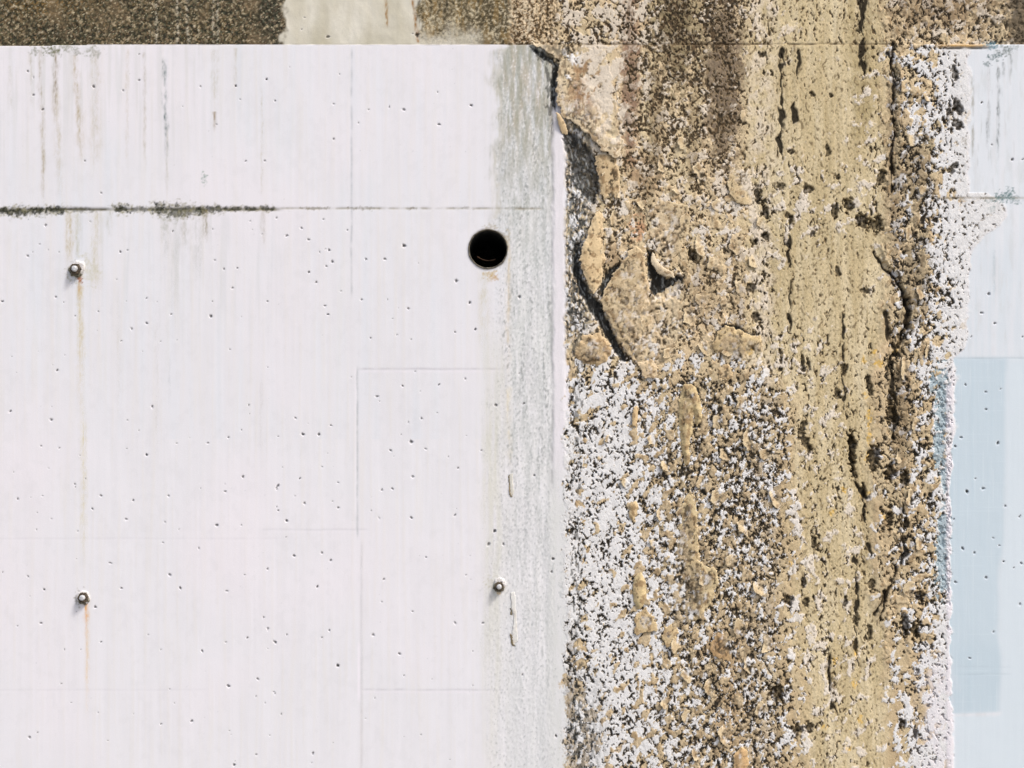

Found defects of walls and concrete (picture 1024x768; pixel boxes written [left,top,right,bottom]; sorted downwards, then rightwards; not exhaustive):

corrosion [64,252,104,566]
water stain [0,0,286,327]
water stain [416,0,757,768]
spalling [531,0,1007,768]